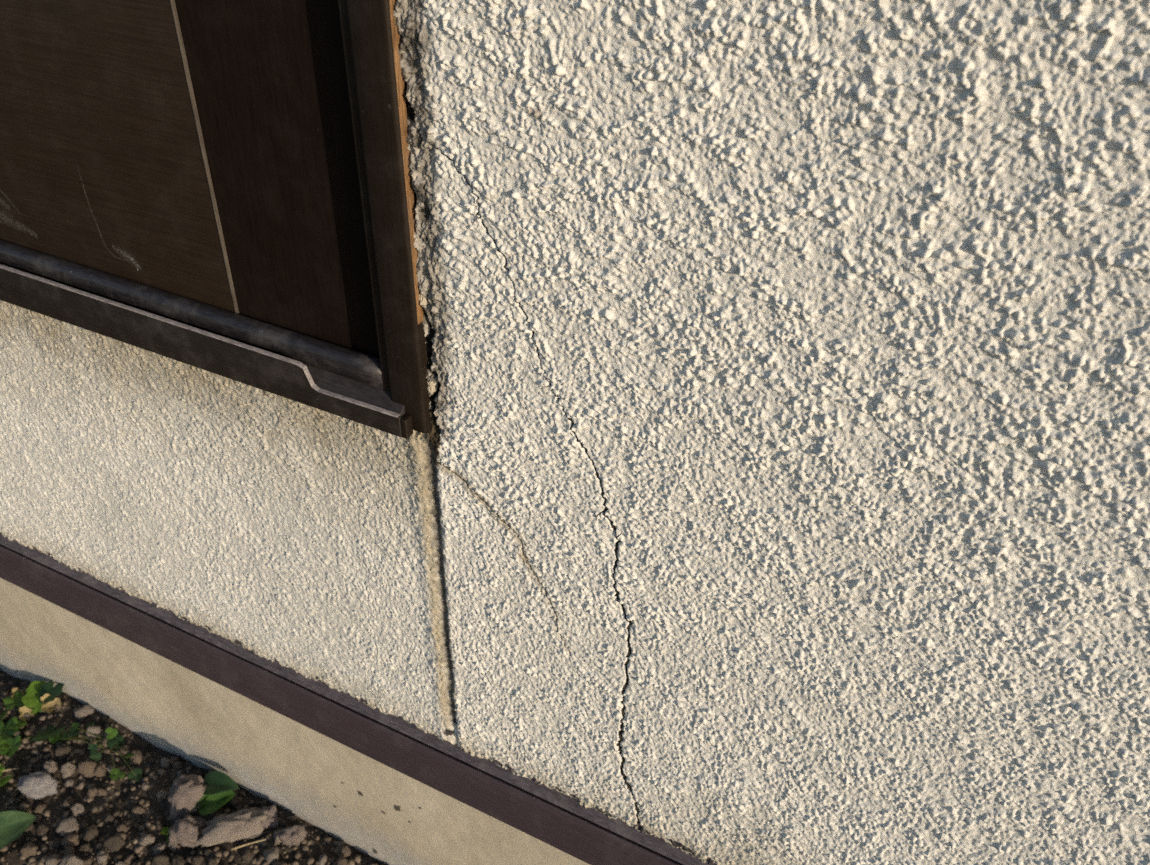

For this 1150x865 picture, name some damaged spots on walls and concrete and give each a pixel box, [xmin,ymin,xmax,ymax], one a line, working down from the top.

water stain [398,20,423,148]
water stain [414,174,435,274]
water stain [0,300,384,445]
water stain [400,284,449,722]
crack [414,126,640,823]